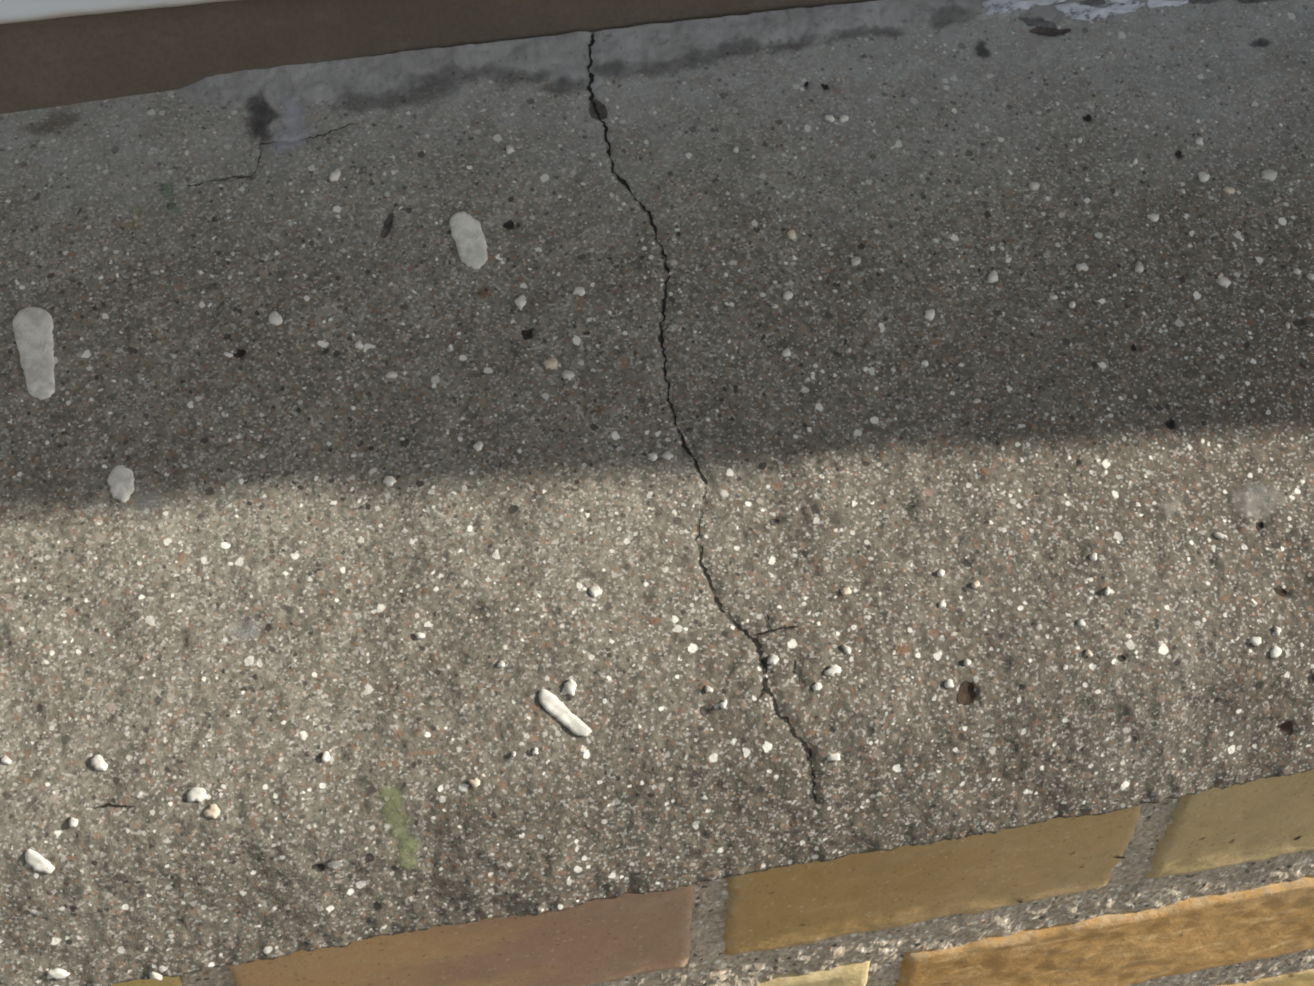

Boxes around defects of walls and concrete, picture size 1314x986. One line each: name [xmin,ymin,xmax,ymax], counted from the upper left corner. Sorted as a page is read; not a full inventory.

crack [587,33,816,802]